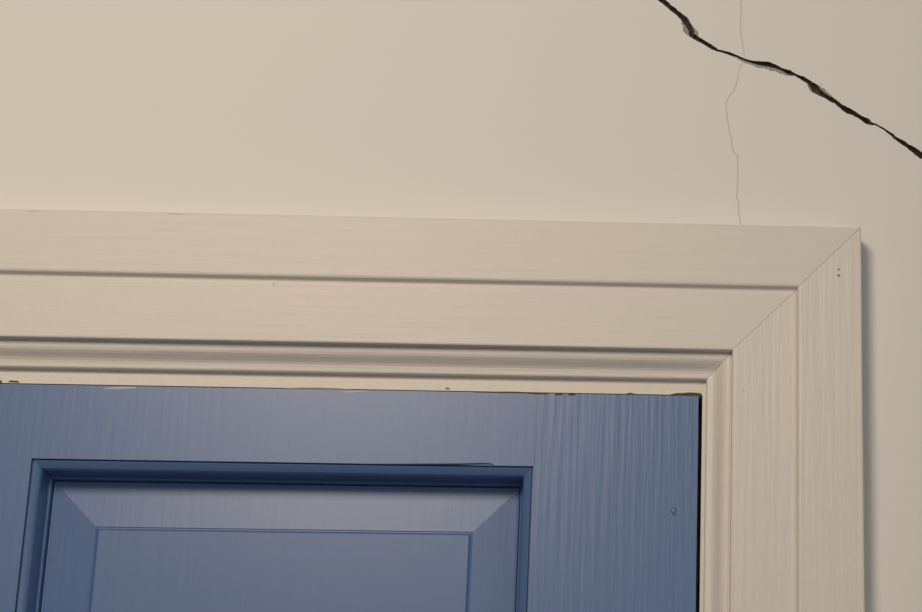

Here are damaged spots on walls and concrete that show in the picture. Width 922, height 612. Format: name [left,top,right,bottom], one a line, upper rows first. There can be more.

crack [658,0,922,225]